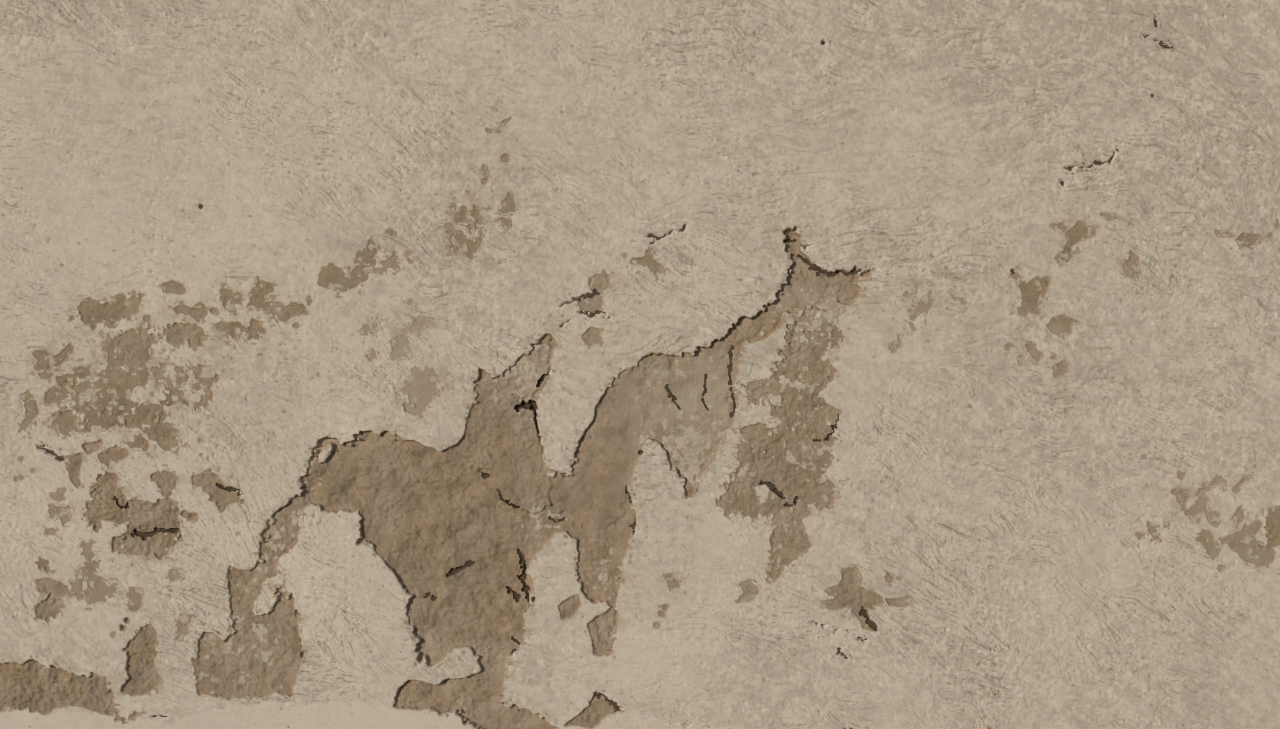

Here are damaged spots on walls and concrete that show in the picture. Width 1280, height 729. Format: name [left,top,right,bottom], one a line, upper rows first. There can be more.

peeling [1006,212,1115,377]
peeling [0,227,401,722]
flaking render [174,228,874,729]
peeling [1135,521,1170,542]
peeling [1171,470,1280,574]
peeling [824,566,915,632]
crack [595,690,625,712]